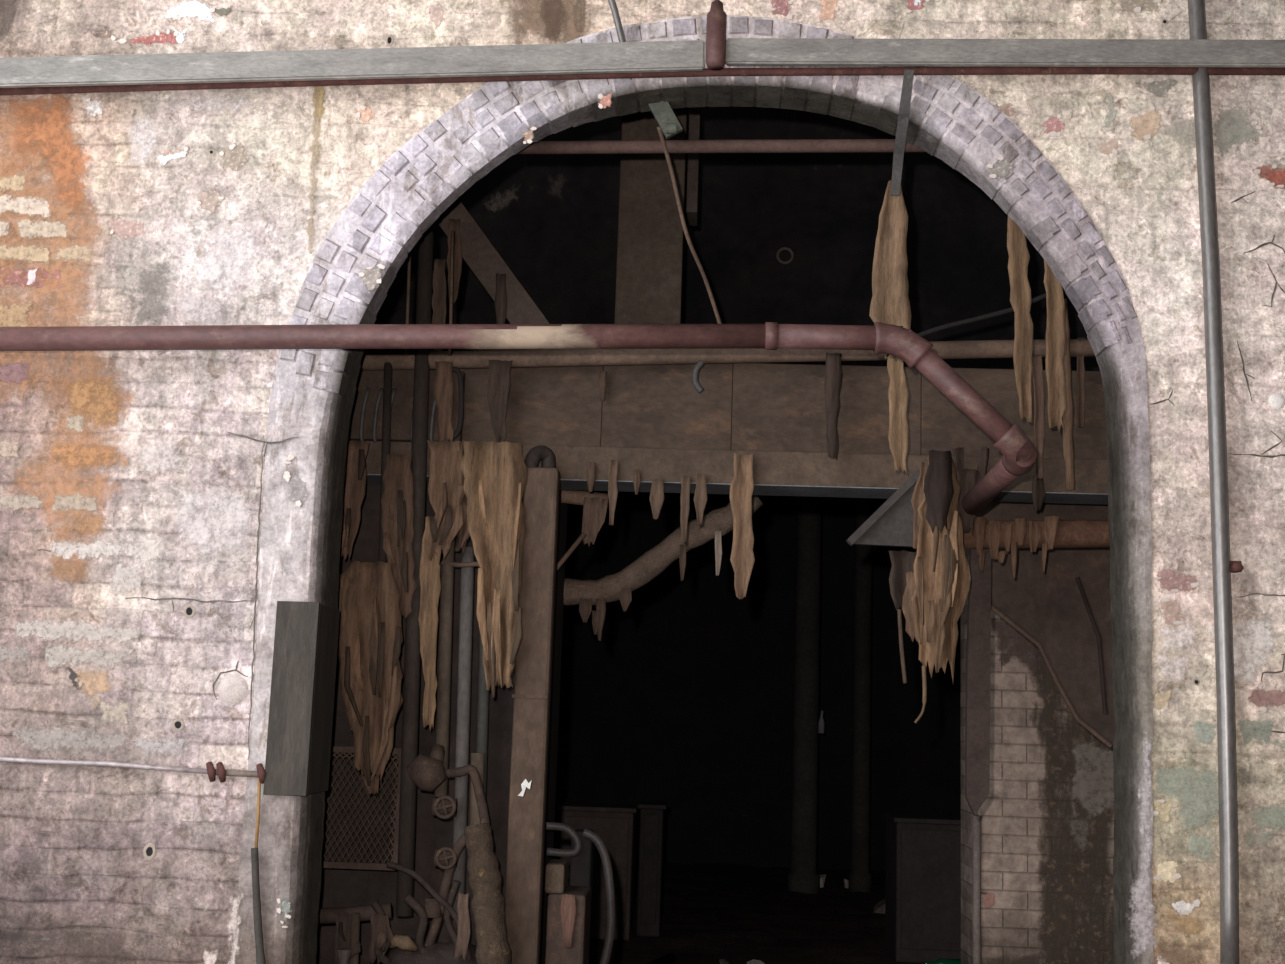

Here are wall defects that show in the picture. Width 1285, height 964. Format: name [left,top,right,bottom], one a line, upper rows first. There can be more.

water stain [512,0,585,42]
corrosion [0,94,98,327]
crack [1244,235,1285,307]
corrosion [0,351,133,581]
peeling [1154,569,1214,710]
peeling [1232,620,1285,748]
crack [1240,591,1285,599]
crack [1261,654,1285,682]
water stain [986,619,1114,964]
water stain [1132,733,1196,964]